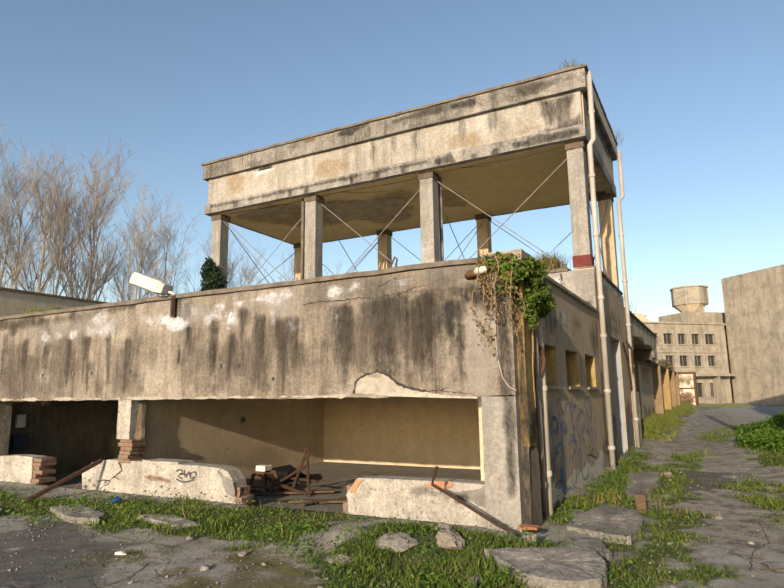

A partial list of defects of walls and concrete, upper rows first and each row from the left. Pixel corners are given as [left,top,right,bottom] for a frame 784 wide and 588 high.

damp [393,99,475,123]
damp [514,82,613,162]
damp [249,174,359,200]
damp [0,307,115,381]
damp [147,298,197,337]
damp [205,290,300,372]
spalling [117,370,478,400]
crack [99,463,122,489]